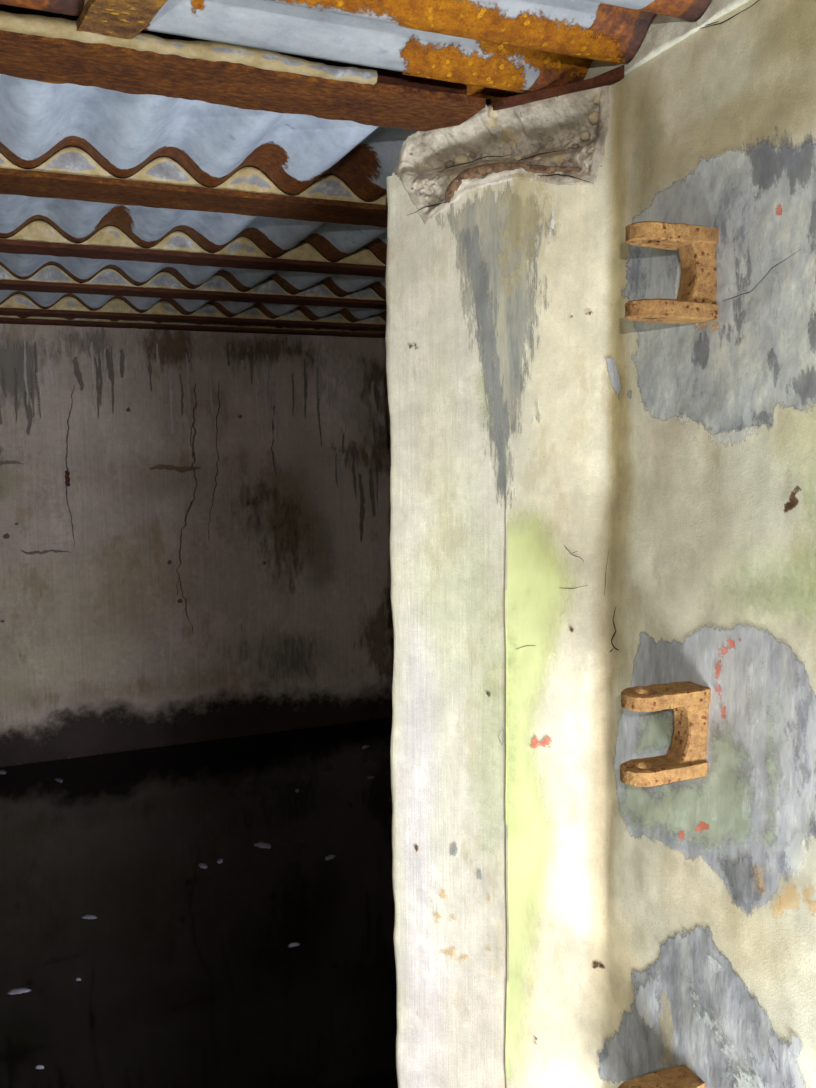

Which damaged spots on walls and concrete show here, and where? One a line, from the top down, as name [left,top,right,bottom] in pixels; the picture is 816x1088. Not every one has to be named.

rust [191,0,205,14]
rust [272,0,626,102]
leakage [0,339,54,434]
leakage [65,331,124,419]
leakage [145,330,192,438]
crack [176,383,221,634]
leakage [227,337,322,458]
leakage [335,361,389,541]
leakage [435,181,554,509]
peeling [606,140,816,446]
peeling [613,624,816,915]
peeling [599,926,806,1088]